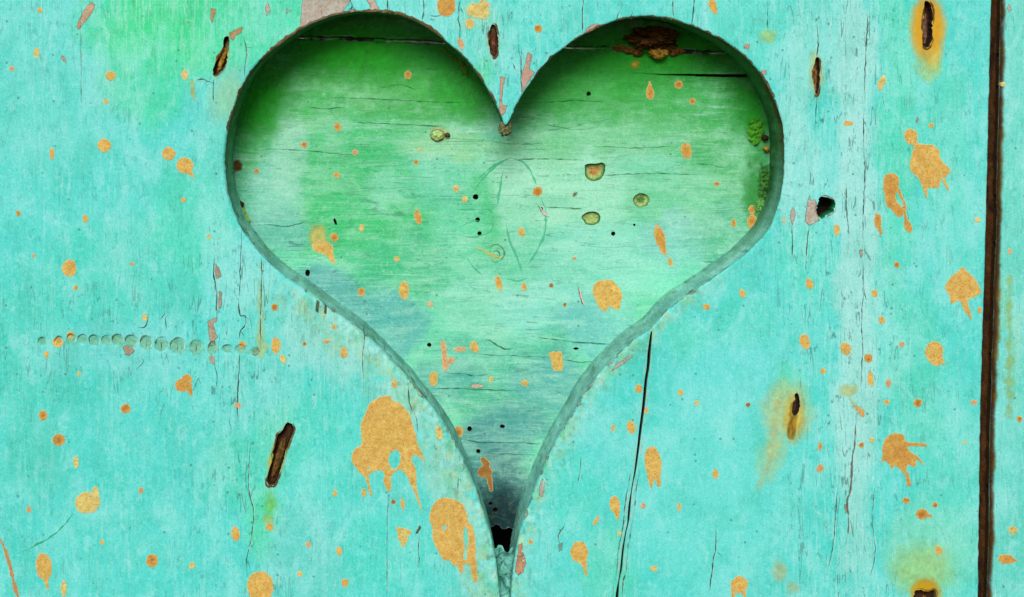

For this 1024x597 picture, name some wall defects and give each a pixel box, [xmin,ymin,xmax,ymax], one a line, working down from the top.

peeling [226,0,517,131]
corrosion [911,0,946,75]
peeling [790,195,820,225]
peeling [208,264,222,364]
corrosion [768,391,806,456]
corrosion [911,579,940,597]